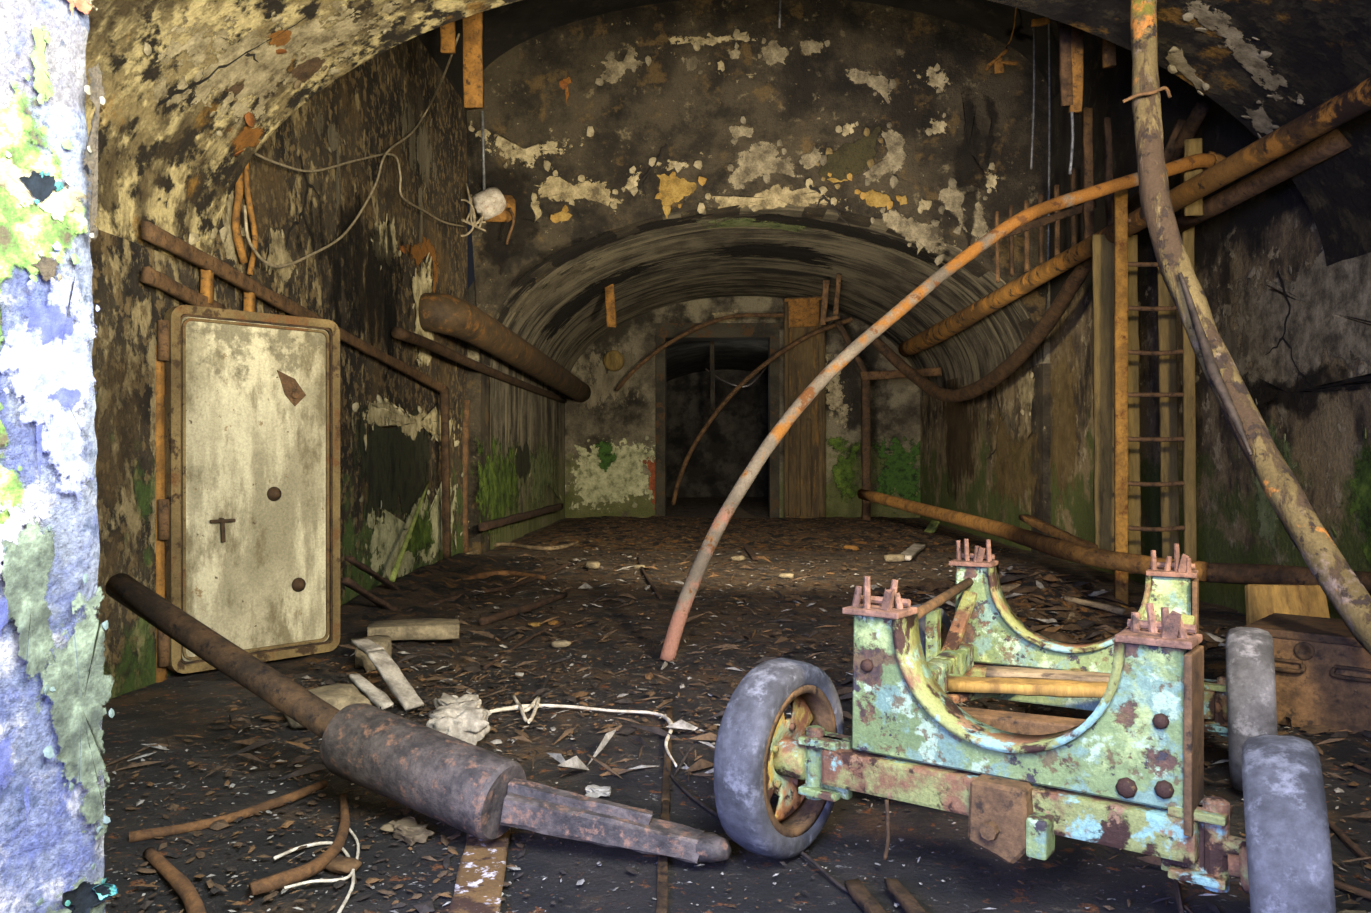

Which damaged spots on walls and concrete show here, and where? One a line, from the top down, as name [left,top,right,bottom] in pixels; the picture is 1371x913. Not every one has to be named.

peeling [143,0,415,136]
flaking render [595,45,652,86]
flaking render [669,28,830,74]
flaking render [844,68,897,105]
flaking render [913,63,951,93]
peeling [1166,46,1210,96]
peeling [1182,0,1305,139]
flaking render [469,113,1000,266]
peeling [265,227,298,284]
peeling [395,91,438,368]
peeling [0,26,115,839]
peeling [559,435,656,512]